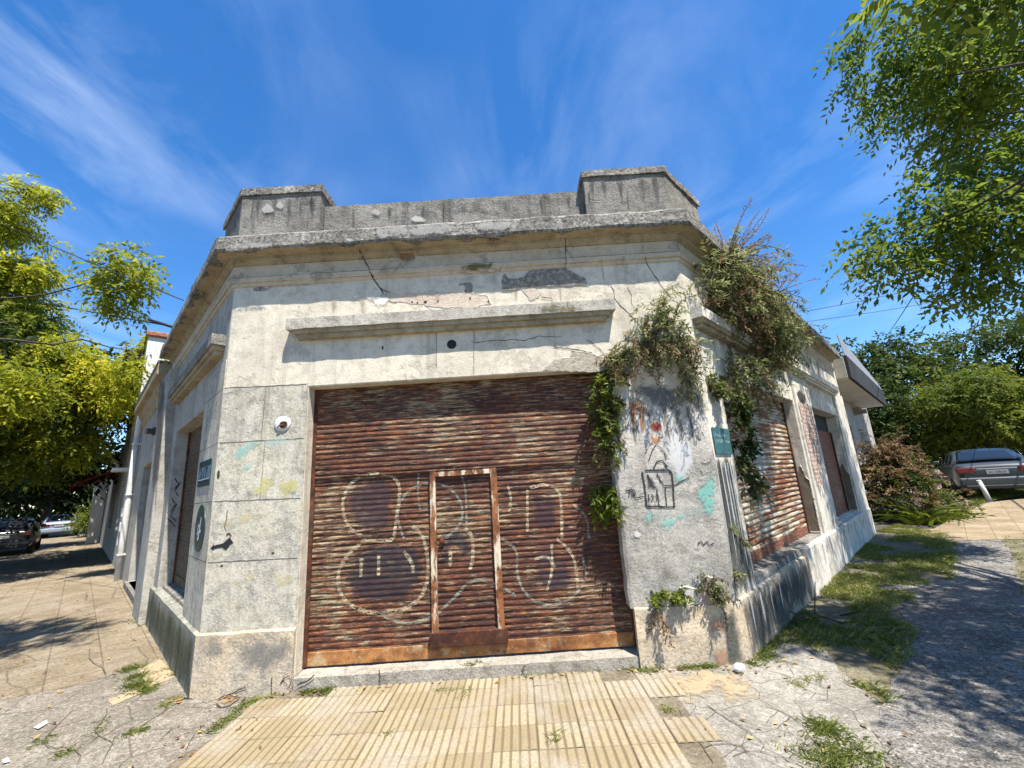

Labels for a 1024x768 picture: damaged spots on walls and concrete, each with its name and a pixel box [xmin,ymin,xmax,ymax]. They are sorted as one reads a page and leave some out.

crack [359,249,389,293]
spalling [353,268,589,309]
water stain [716,457,864,661]